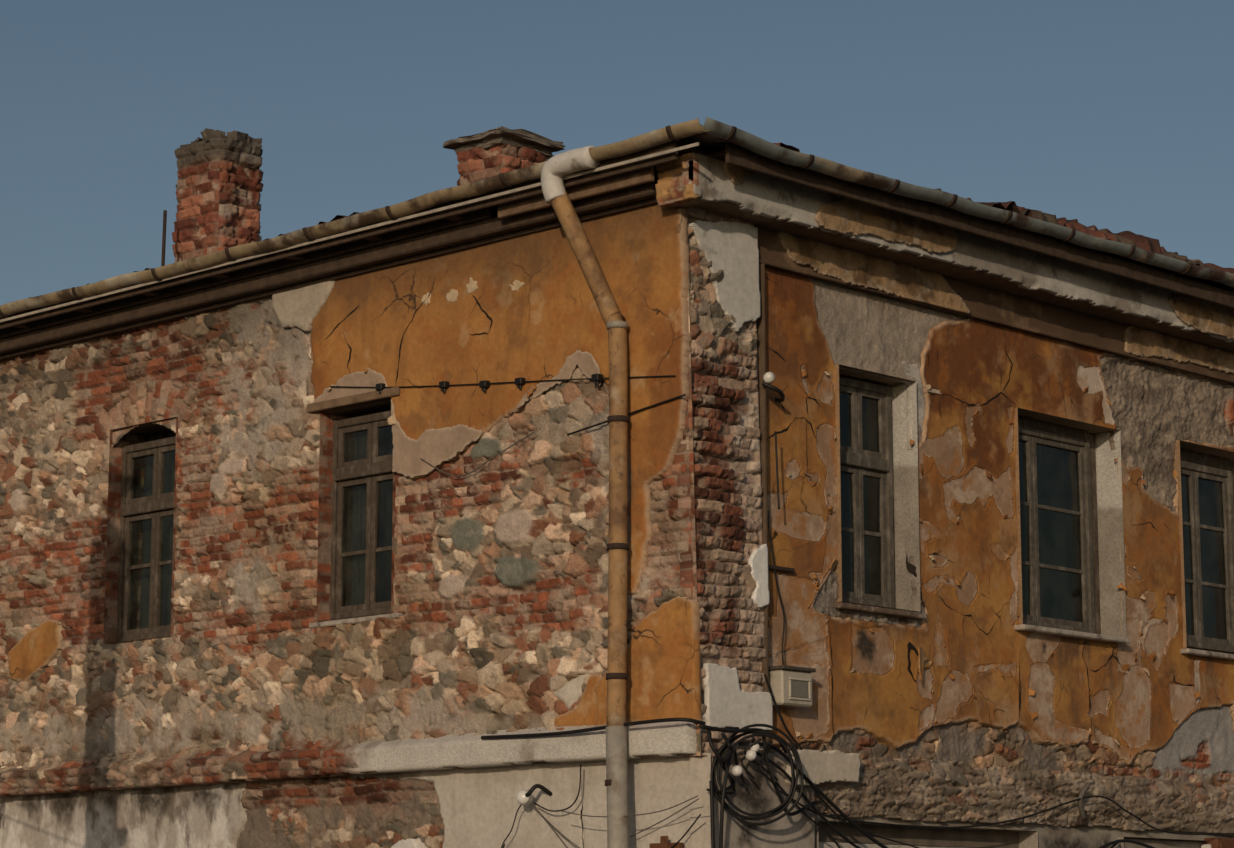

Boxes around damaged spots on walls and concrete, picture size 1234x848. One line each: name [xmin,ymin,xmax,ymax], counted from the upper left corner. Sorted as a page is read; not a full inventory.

crack [324,307,358,374]
spalling [446,277,478,302]
crack [469,296,493,335]
spalling [509,280,525,291]
peeling [313,368,483,478]
peeling [514,350,601,412]
crack [766,348,821,481]
crack [902,346,1015,416]
spalling [767,197,1234,790]
crack [906,552,1003,635]
crack [907,642,918,683]
spalling [236,777,444,848]